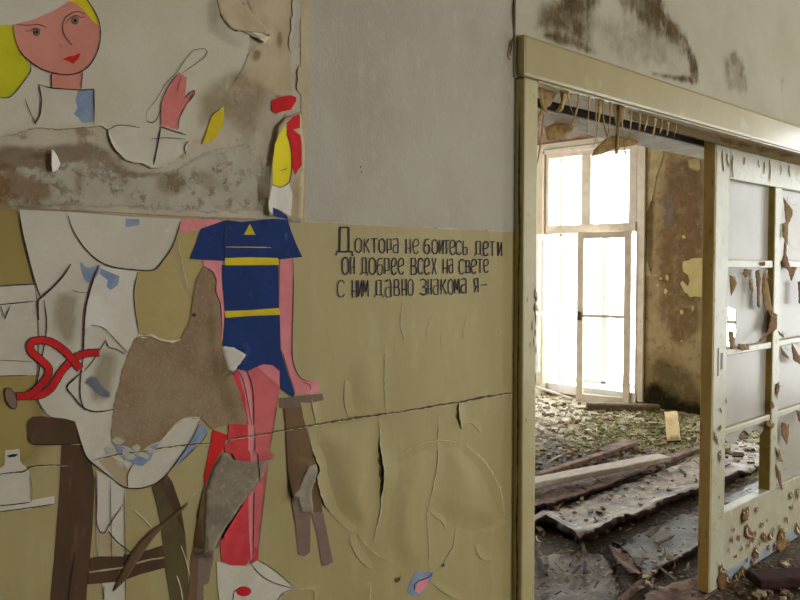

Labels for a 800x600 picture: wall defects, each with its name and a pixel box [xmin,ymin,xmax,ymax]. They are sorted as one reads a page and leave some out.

peeling [0,0,311,223]
leakage [542,0,595,51]
peeling [537,87,677,213]
leakage [625,0,678,42]
leakage [665,48,698,84]
peeling [782,197,800,304]
peeling [105,267,247,467]
crack [233,111,521,600]
leakage [644,359,700,415]
peeling [728,261,800,364]
crack [0,464,62,475]
crack [96,443,210,461]